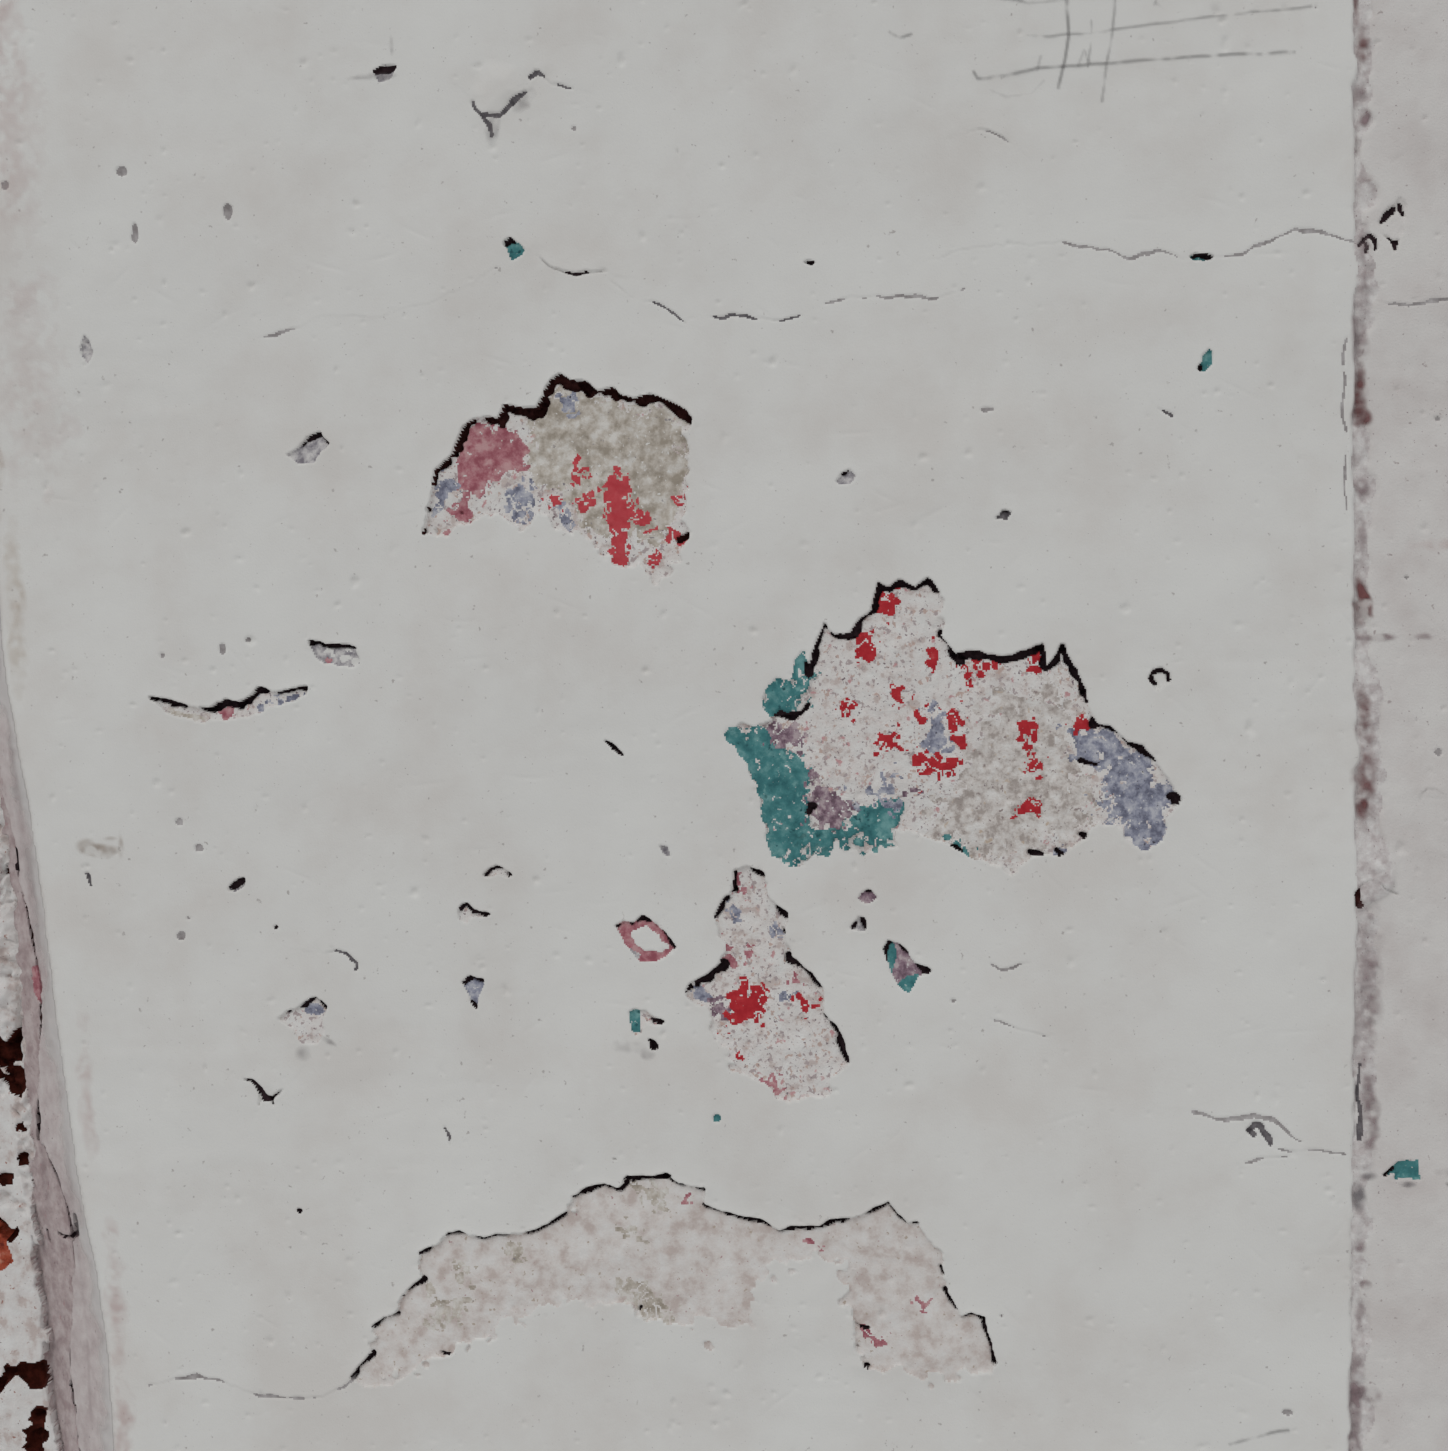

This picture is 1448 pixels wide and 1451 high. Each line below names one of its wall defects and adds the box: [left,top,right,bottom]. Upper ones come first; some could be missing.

crack [1062,241,1178,260]
crack [1224,228,1377,257]
crack [565,269,589,277]
crack [652,288,965,322]
crack [264,328,295,338]
peeling [422,374,692,585]
flaking render [150,686,308,722]
peeling [685,577,1181,1102]
peeling [616,915,676,962]
peeling [350,1173,1002,1389]